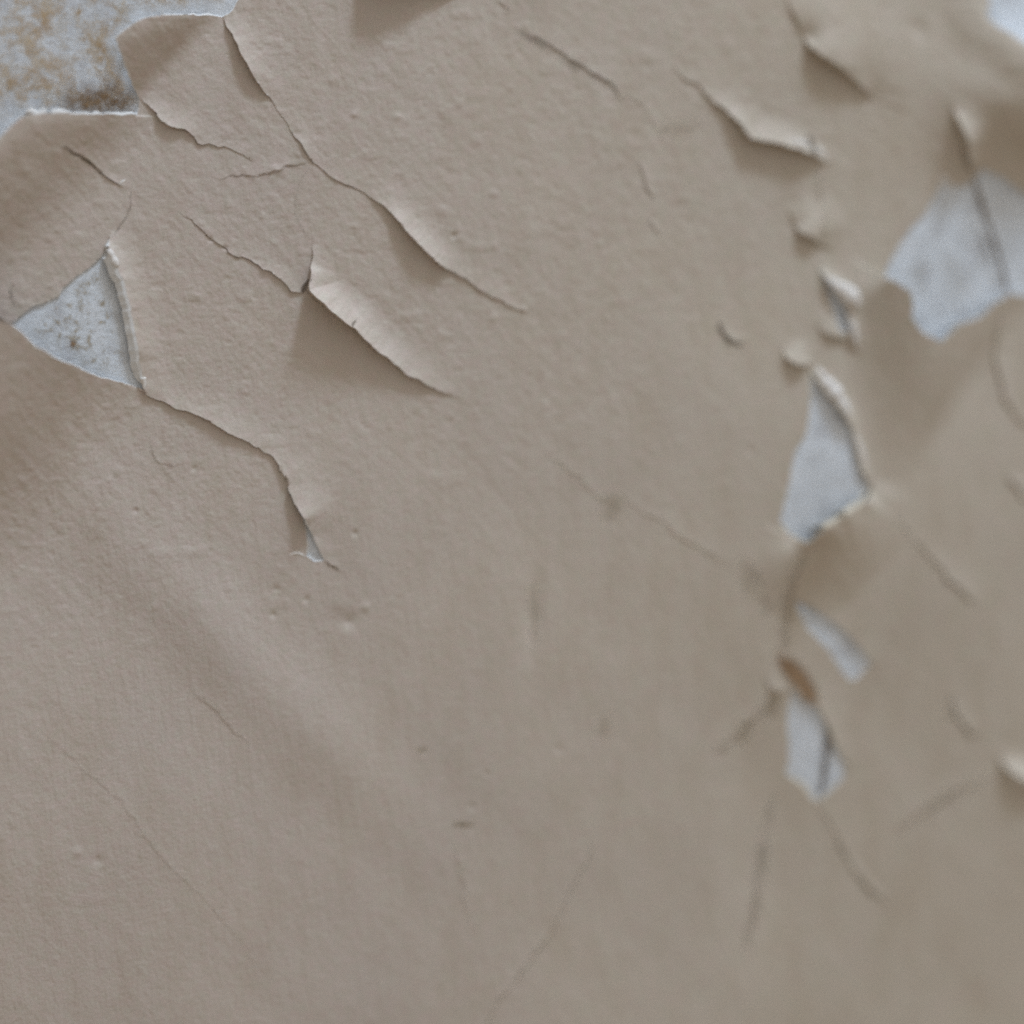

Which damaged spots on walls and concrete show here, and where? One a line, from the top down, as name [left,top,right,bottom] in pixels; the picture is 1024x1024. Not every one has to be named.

crack [65,147,126,187]
peeling [0,0,238,287]
crack [140,94,248,158]
crack [223,9,526,312]
peeling [676,69,833,163]
peeling [0,231,166,578]
crack [137,384,296,485]
peeling [747,154,1024,618]
peeling [764,677,851,801]